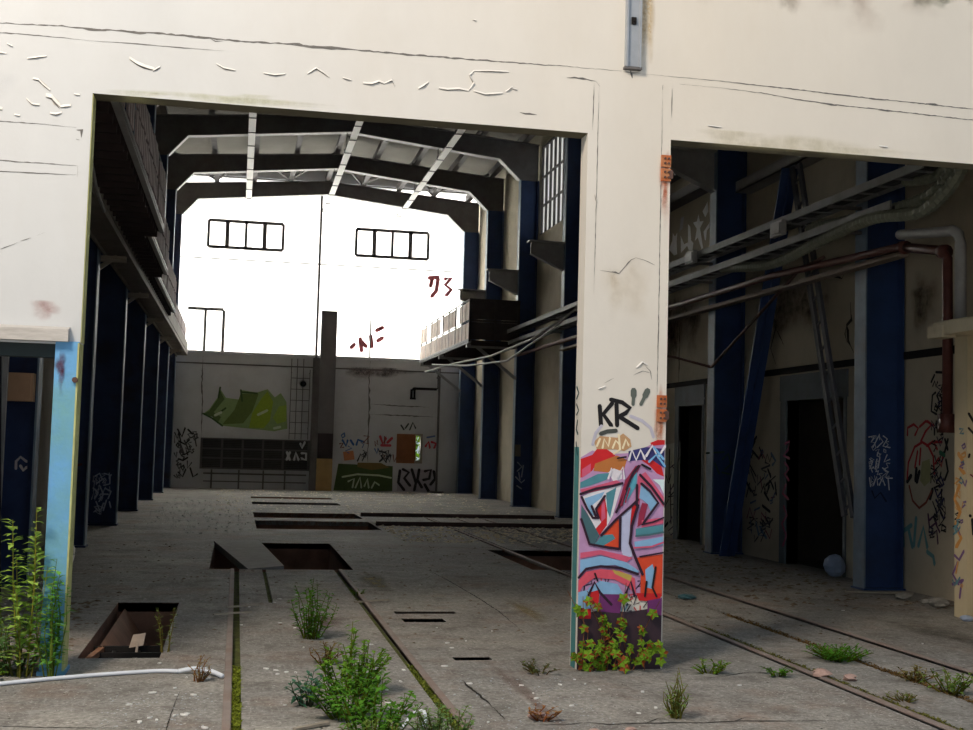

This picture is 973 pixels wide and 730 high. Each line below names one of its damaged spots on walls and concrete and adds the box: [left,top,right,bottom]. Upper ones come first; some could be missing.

peeling [26,77,80,116]
peeling [129,57,160,71]
peeling [439,70,517,95]
crack [0,22,972,382]